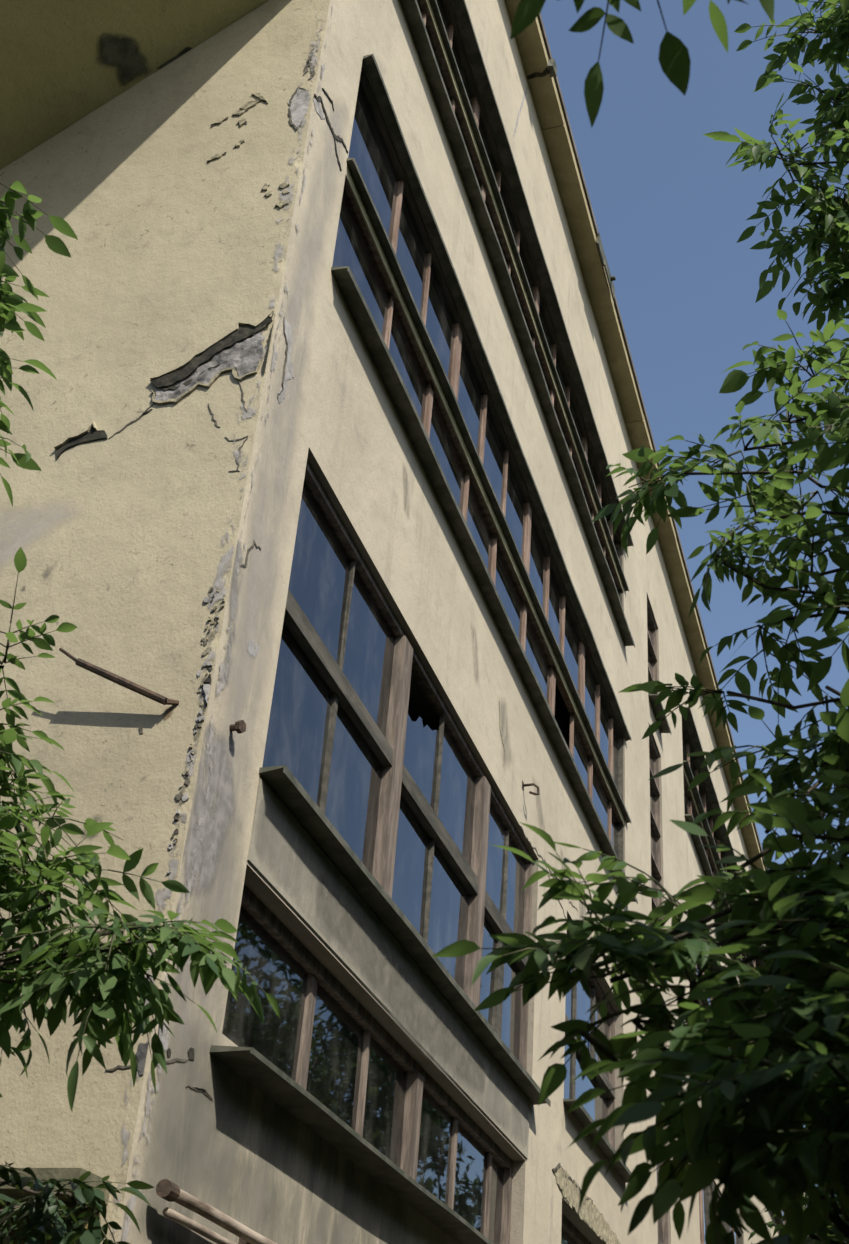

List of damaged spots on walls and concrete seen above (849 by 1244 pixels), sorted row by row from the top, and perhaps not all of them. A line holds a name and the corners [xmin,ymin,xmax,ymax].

damp [99,34,192,85]
peeling [207,93,268,163]
crack [288,48,348,171]
spalling [108,311,294,439]
crack [208,382,248,472]
flaking render [167,541,242,891]